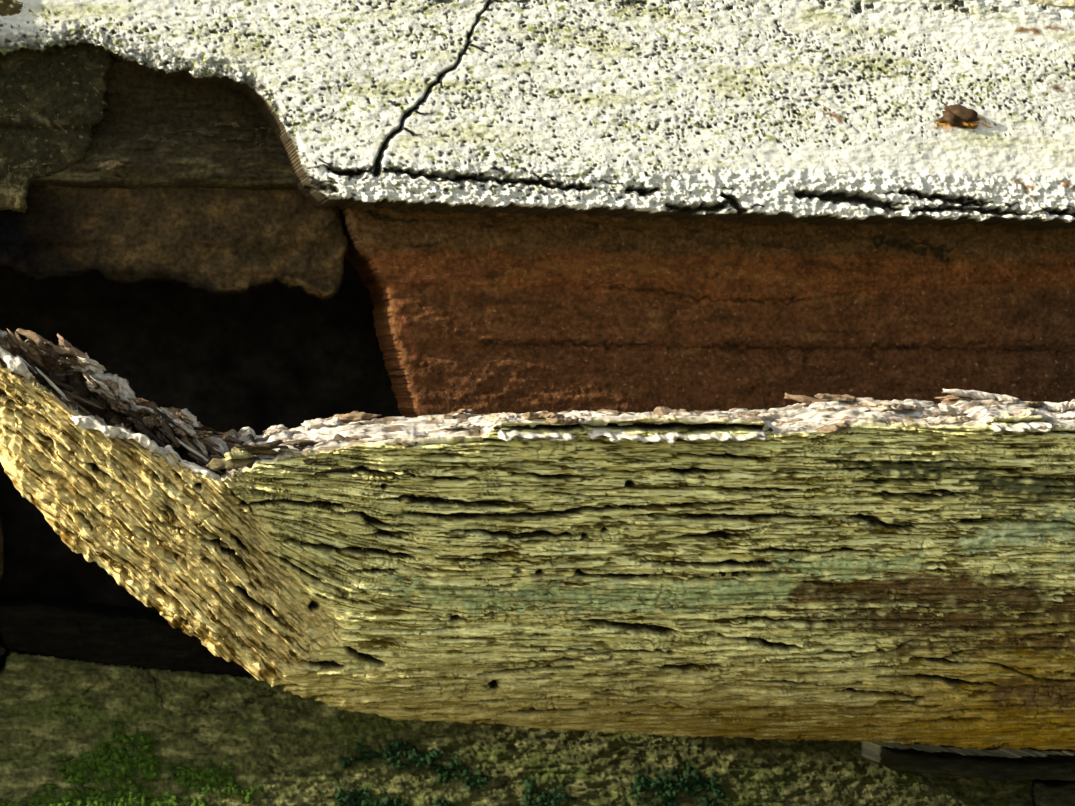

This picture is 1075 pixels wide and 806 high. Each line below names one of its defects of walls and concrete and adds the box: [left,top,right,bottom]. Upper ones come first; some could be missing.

spalling [0,56,361,300]
crack [356,0,498,177]
corrosion [934,117,993,131]